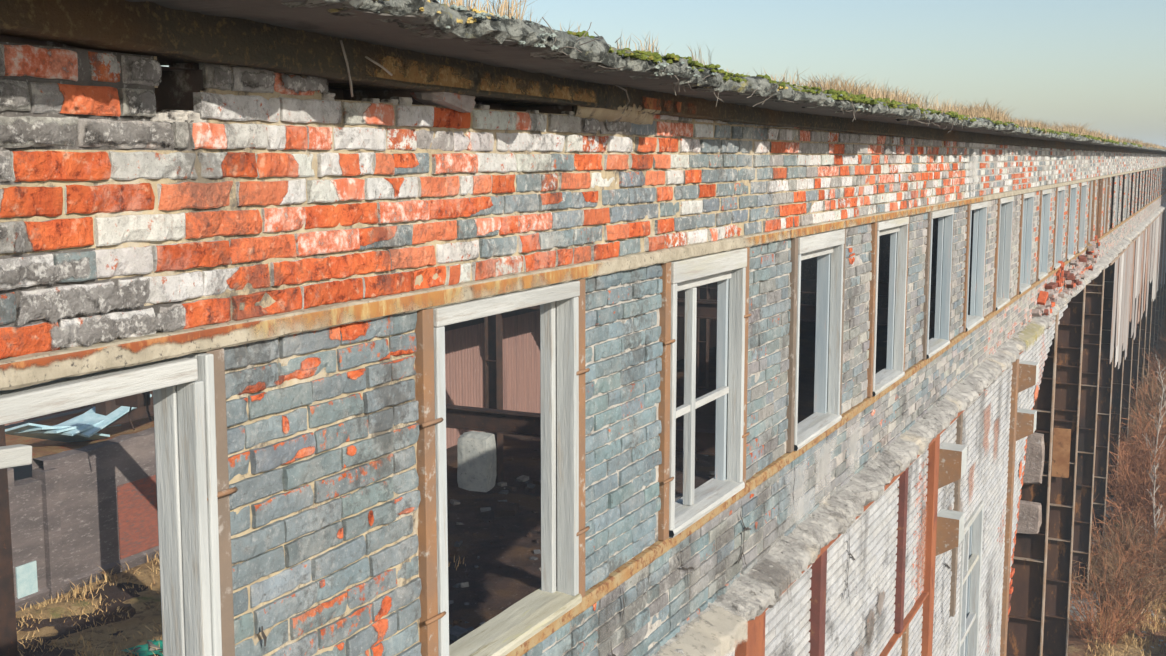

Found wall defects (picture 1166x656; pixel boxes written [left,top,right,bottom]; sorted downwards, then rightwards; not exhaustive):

flaking render [0,45,716,359]
spalling [1031,235,1100,329]
rust [0,263,599,369]
flaking render [240,357,321,402]
flaking render [347,369,364,380]
flaking render [380,349,414,364]
flaking render [282,446,315,465]
flaking render [341,445,357,477]
flaking render [365,596,392,656]
spalling [660,607,748,656]